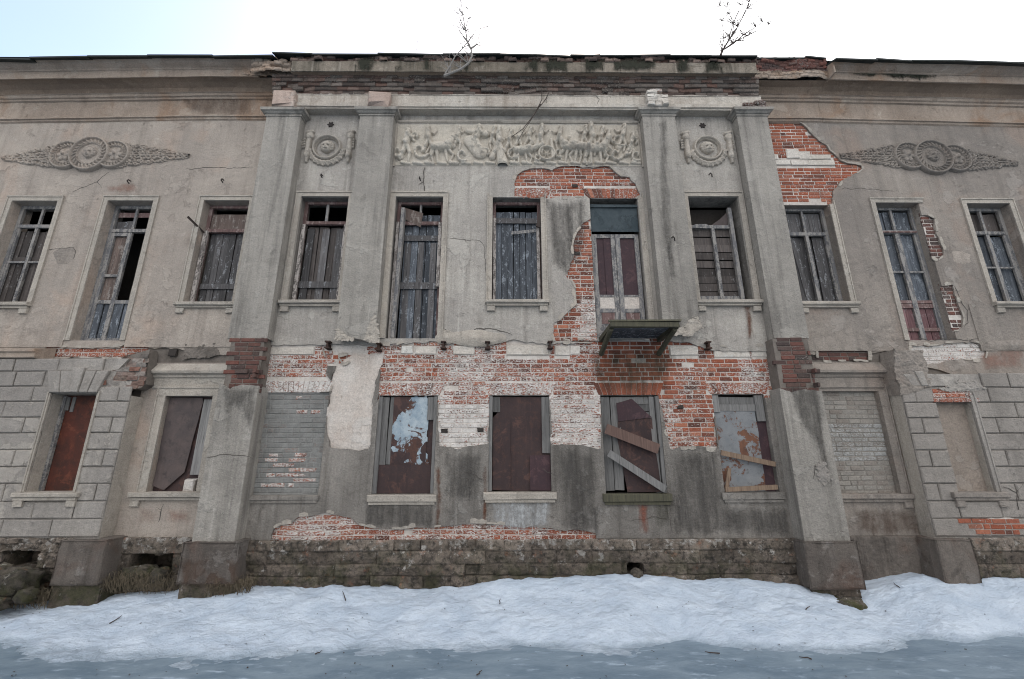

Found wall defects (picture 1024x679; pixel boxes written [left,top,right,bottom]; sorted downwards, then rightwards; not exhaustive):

flaking render [512,163,641,200]
flaking render [769,122,864,207]
flaking render [918,213,947,261]
flaking render [47,342,149,389]
flaking render [168,220,872,465]
flaking render [893,282,988,403]
flaking render [272,510,596,541]
water stain [498,503,547,527]
flaking render [958,517,1024,535]